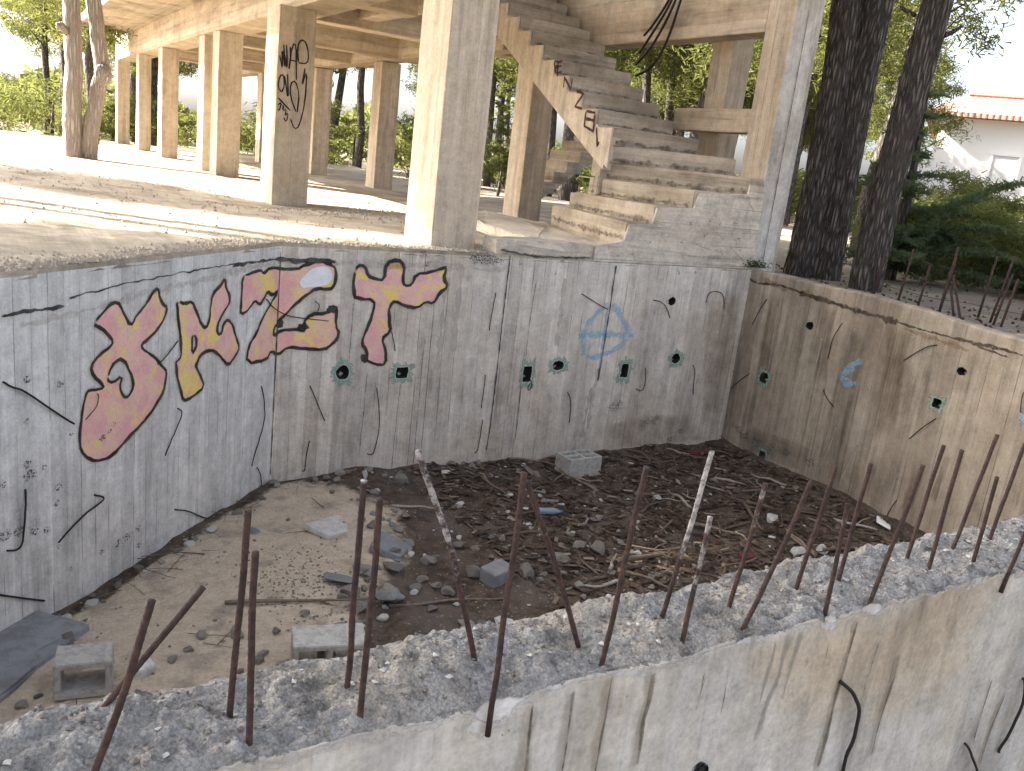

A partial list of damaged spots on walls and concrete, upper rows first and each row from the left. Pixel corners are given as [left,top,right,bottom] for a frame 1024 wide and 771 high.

crack [750,14,1023,357]
crack [2,254,336,475]
spalling [91,585,206,771]
spalling [226,508,259,746]
spalling [344,479,391,718]
spalling [415,449,477,661]
spalling [467,471,581,738]
spalling [599,466,650,666]
spalling [651,450,715,644]
spalling [740,478,815,631]
spalling [823,463,873,630]
spalling [862,444,946,616]